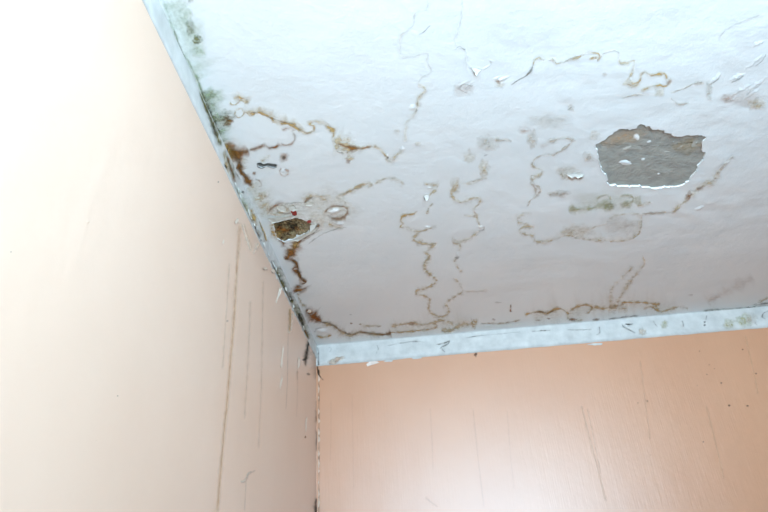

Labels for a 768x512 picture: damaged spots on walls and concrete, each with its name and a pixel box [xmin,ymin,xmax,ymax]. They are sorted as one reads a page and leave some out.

water stain [190,66,299,145]
water stain [327,126,369,160]
peeling [595,124,705,190]
flaking render [268,202,319,245]
water stain [276,269,309,365]
water stain [380,226,477,336]
water stain [526,293,677,320]